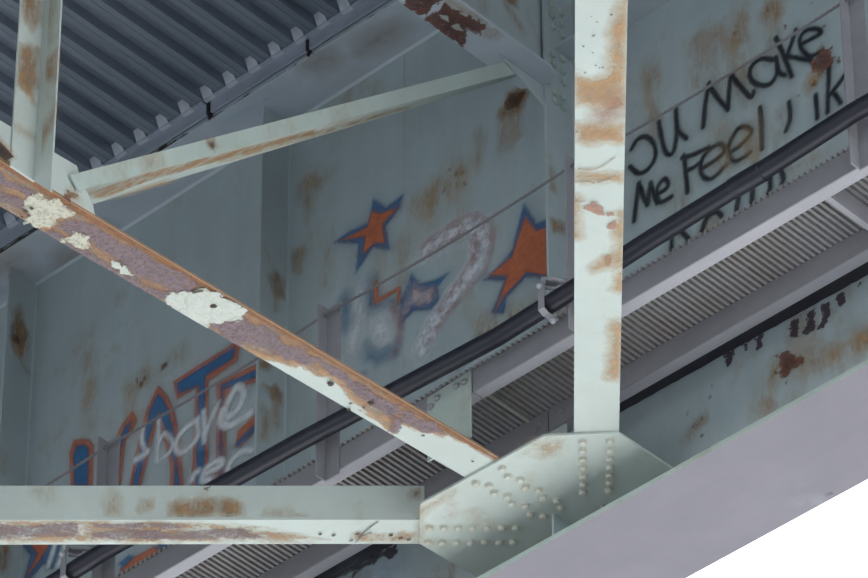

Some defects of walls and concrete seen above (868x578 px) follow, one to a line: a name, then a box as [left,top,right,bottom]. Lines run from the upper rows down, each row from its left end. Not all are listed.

rust [503,88,526,115]
rust [577,8,627,142]
rust [809,47,841,86]
peeling [0,173,36,218]
rust [96,131,320,197]
peeling [45,218,204,300]
rust [593,248,622,291]
rust [0,161,498,460]
peeling [211,316,454,436]
rust [608,324,621,378]
rust [771,351,804,383]
rust [0,501,307,569]